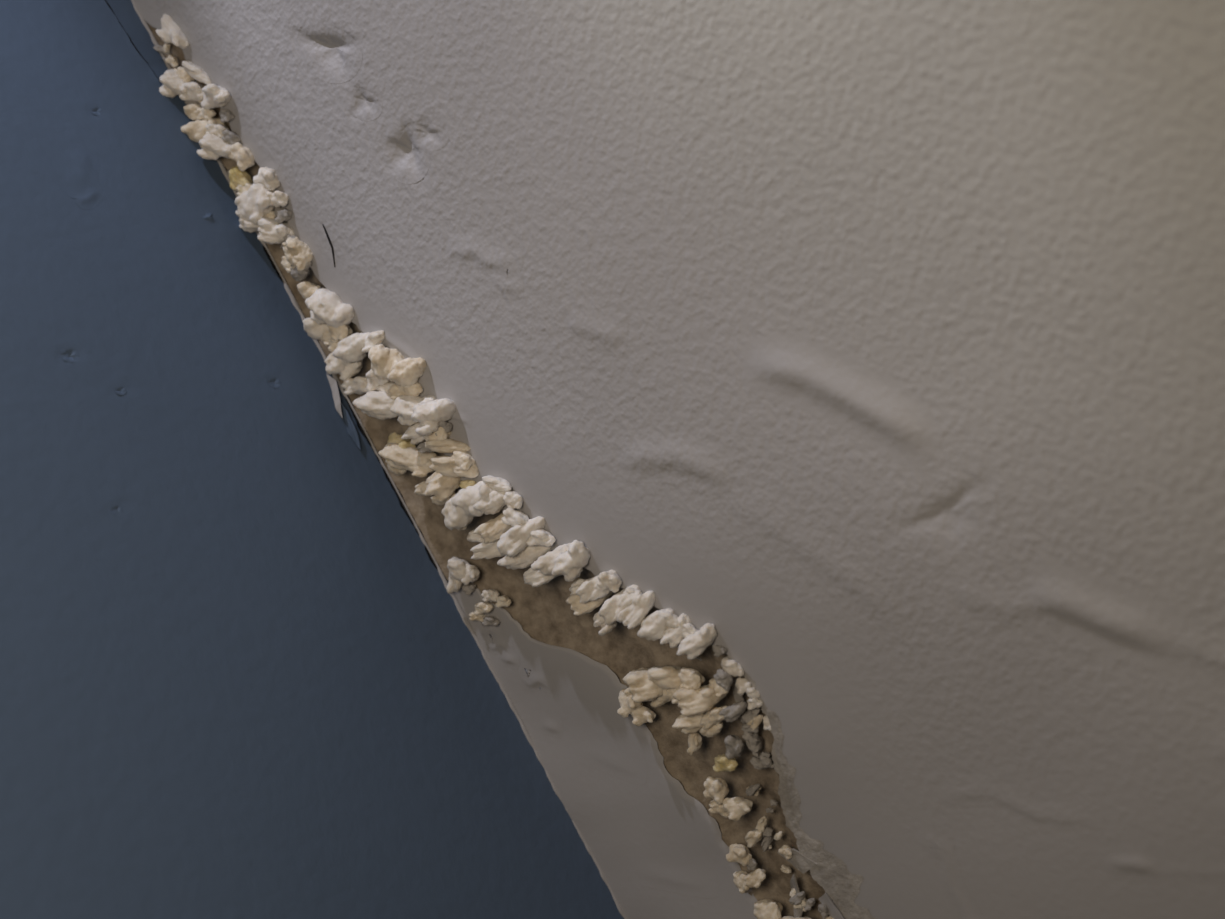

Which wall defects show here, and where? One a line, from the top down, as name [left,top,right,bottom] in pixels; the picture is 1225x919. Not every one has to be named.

crack [263,245,284,284]
crack [364,322,472,427]
water stain [156,14,771,821]
crack [344,396,438,570]
water stain [726,830,812,919]